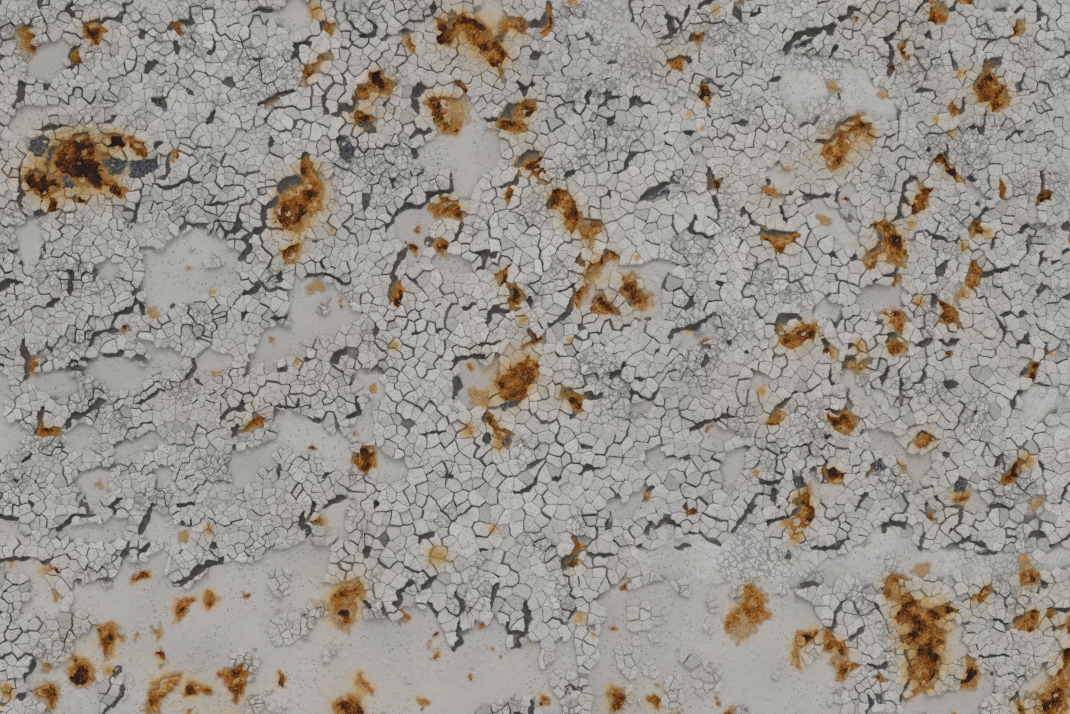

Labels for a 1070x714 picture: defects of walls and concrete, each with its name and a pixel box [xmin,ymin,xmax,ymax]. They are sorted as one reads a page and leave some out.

rust [435,3,554,88]
rust [25,133,148,213]
rust [273,154,324,265]
crack [0,107,253,714]
rust [468,323,544,447]
rust [34,656,95,713]
peeling [0,498,859,714]
crack [321,468,563,652]
crack [527,556,610,669]
crack [588,541,650,590]
rust [883,563,958,701]
crack [821,566,1070,714]